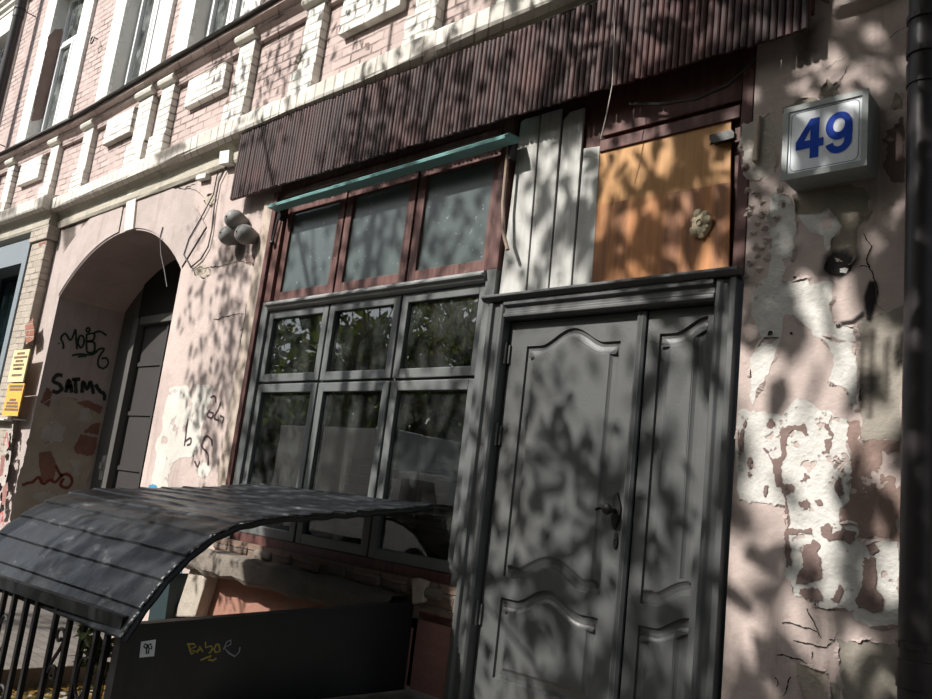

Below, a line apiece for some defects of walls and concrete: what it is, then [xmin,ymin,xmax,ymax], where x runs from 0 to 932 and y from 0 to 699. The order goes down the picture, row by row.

peeling [737,113,779,182]
peeling [782,79,841,113]
peeling [882,92,906,183]
crack [858,233,885,312]
peeling [151,384,213,488]
peeling [734,184,904,699]
crack [775,598,837,697]